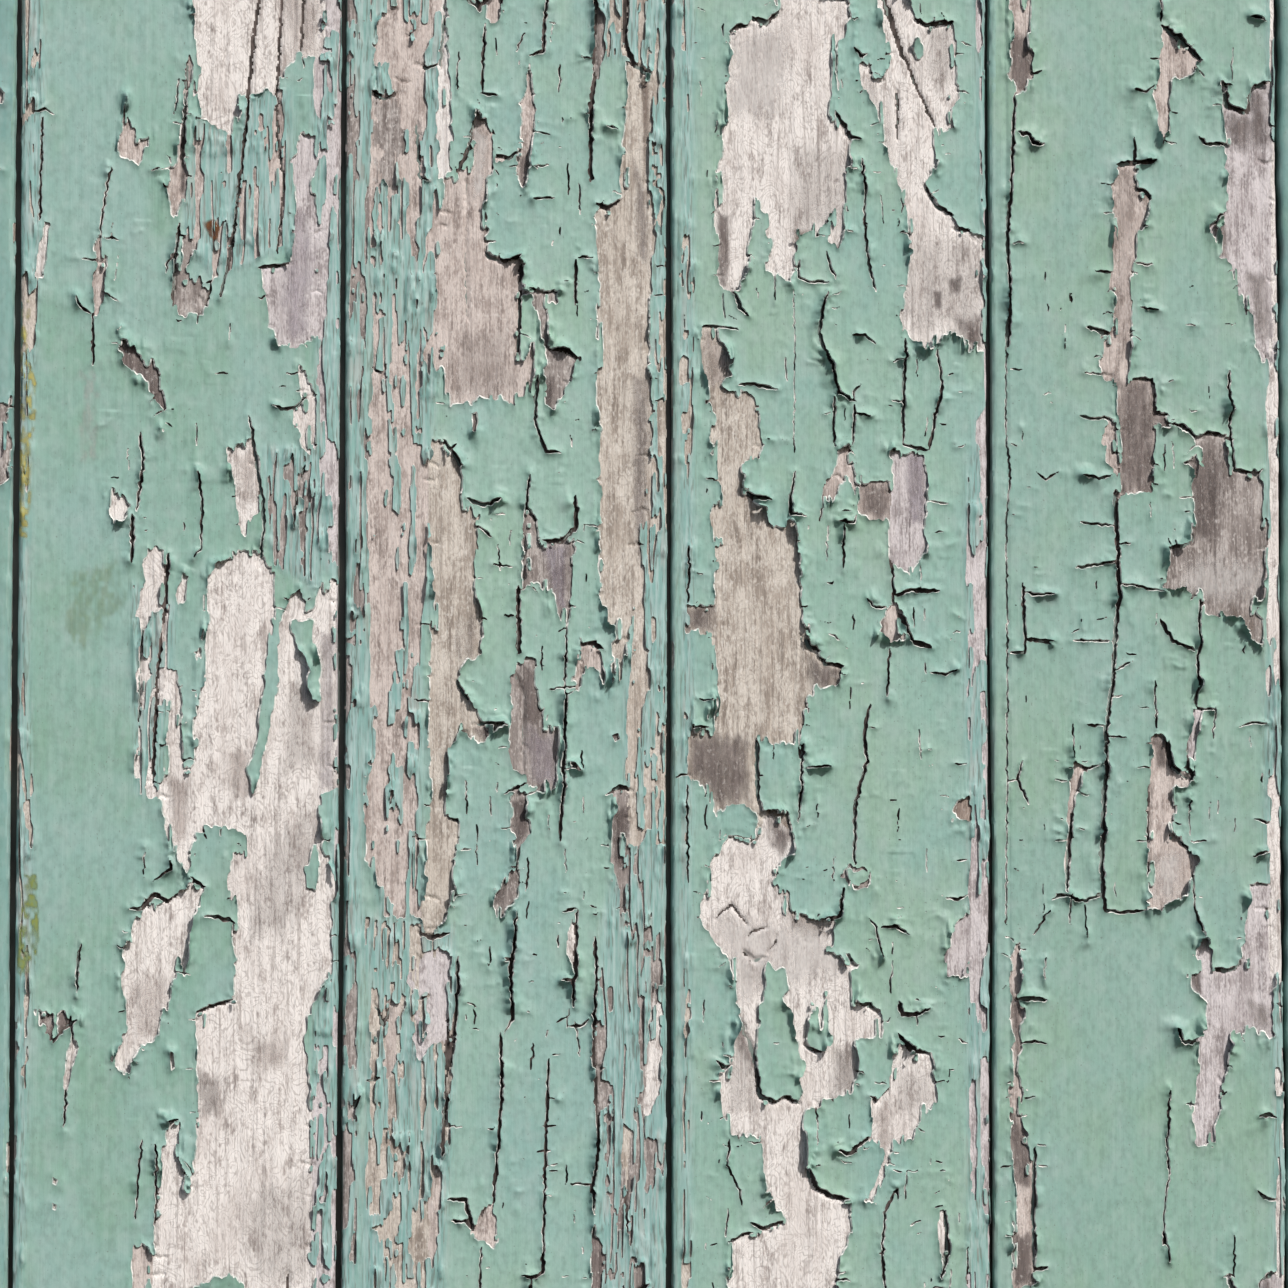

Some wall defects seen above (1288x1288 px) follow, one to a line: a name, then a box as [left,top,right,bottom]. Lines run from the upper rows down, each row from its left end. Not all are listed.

peeling [76,0,1048,1288]
crack [1044,272,1073,349]
peeling [1052,0,1286,1288]